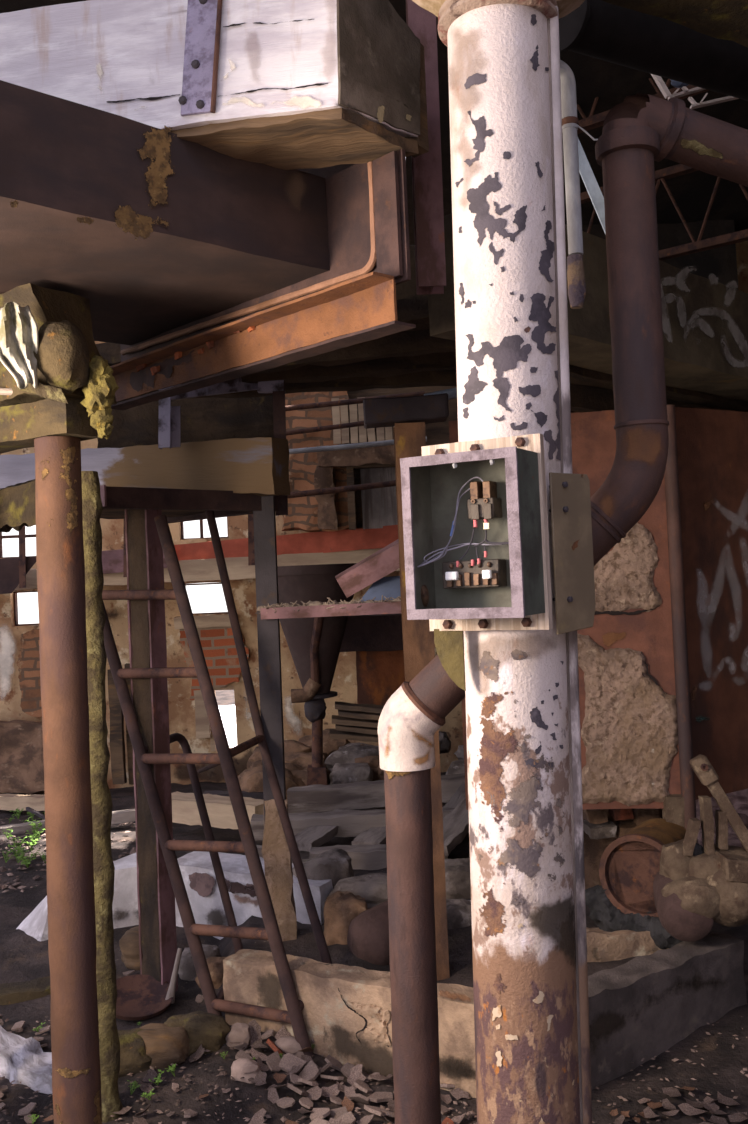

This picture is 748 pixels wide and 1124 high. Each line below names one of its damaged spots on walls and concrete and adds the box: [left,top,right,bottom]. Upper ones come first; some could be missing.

peeling [464,73,486,89]
peeling [530,45,549,71]
peeling [455,111,527,286]
peeling [459,283,475,308]
peeling [462,205,561,461]
spalling [594,523,662,612]
spalling [577,633,678,807]
corrosion [385,730,433,779]
corrosion [477,691,519,831]
corrosion [479,888,506,937]
crack [338,988,389,1047]